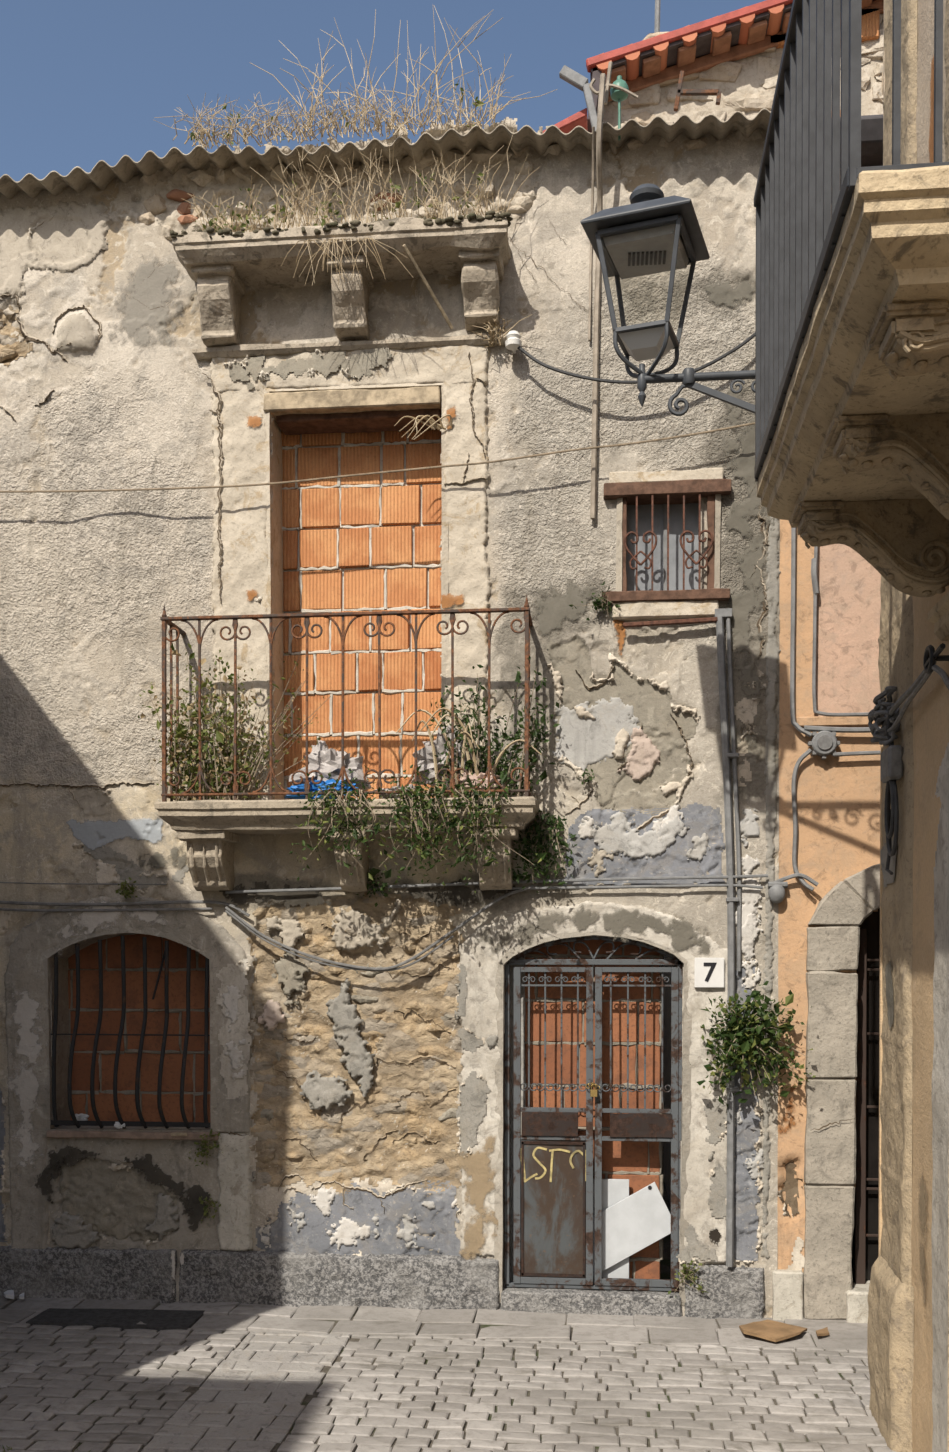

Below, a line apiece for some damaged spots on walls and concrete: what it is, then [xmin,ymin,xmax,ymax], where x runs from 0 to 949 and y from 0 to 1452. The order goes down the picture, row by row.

crack [0,293,70,361]
peeling [224,348,392,390]
peeling [72,843,189,894]
peeling [546,635,766,1017]
peeling [456,964,498,1053]
peeling [455,1071,491,1156]
peeling [676,1052,805,1264]
peeling [256,1180,463,1258]